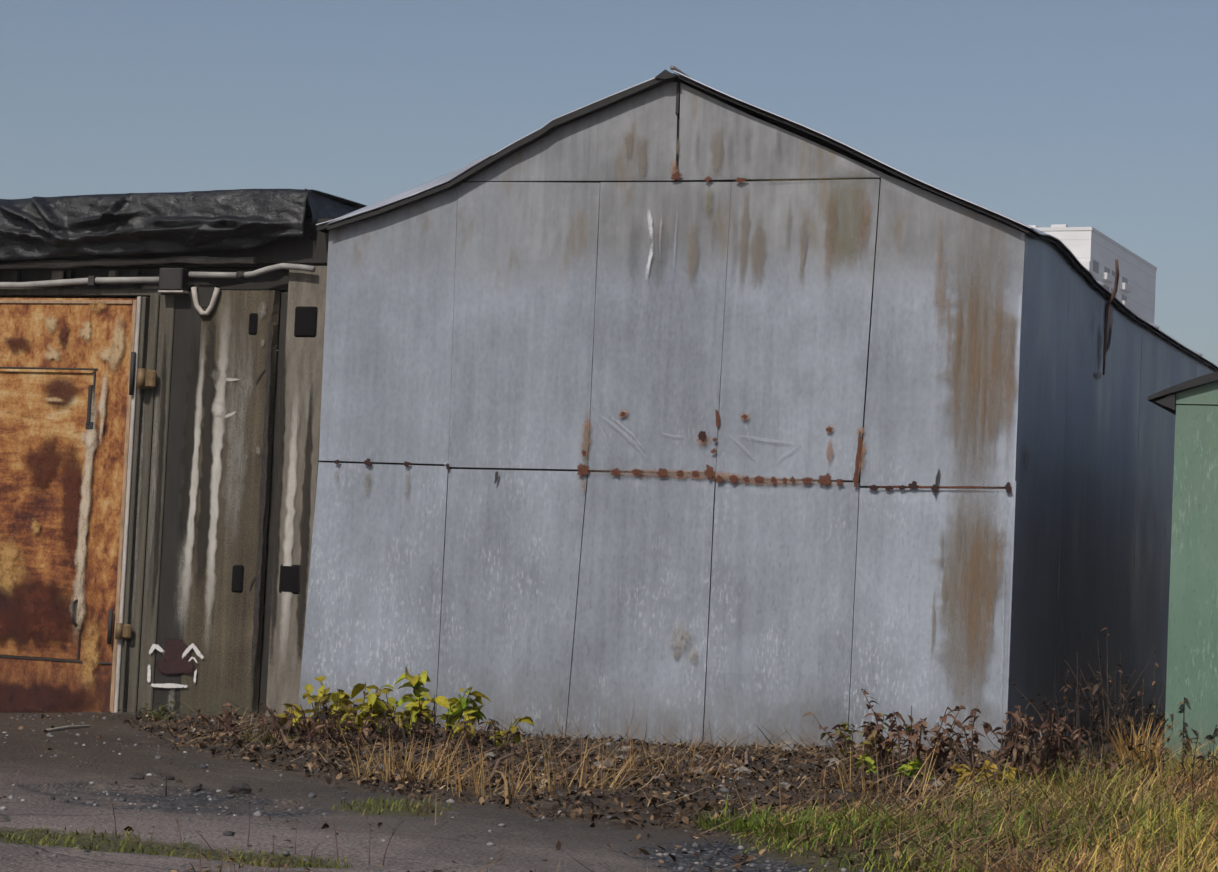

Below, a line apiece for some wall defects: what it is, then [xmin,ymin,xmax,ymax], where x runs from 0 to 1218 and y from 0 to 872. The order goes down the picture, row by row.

water stain [132,342,166,617]
water stain [176,320,253,614]
water stain [270,355,312,658]
rust [577,421,590,490]
rust [611,410,1012,493]
rust [0,682,86,713]